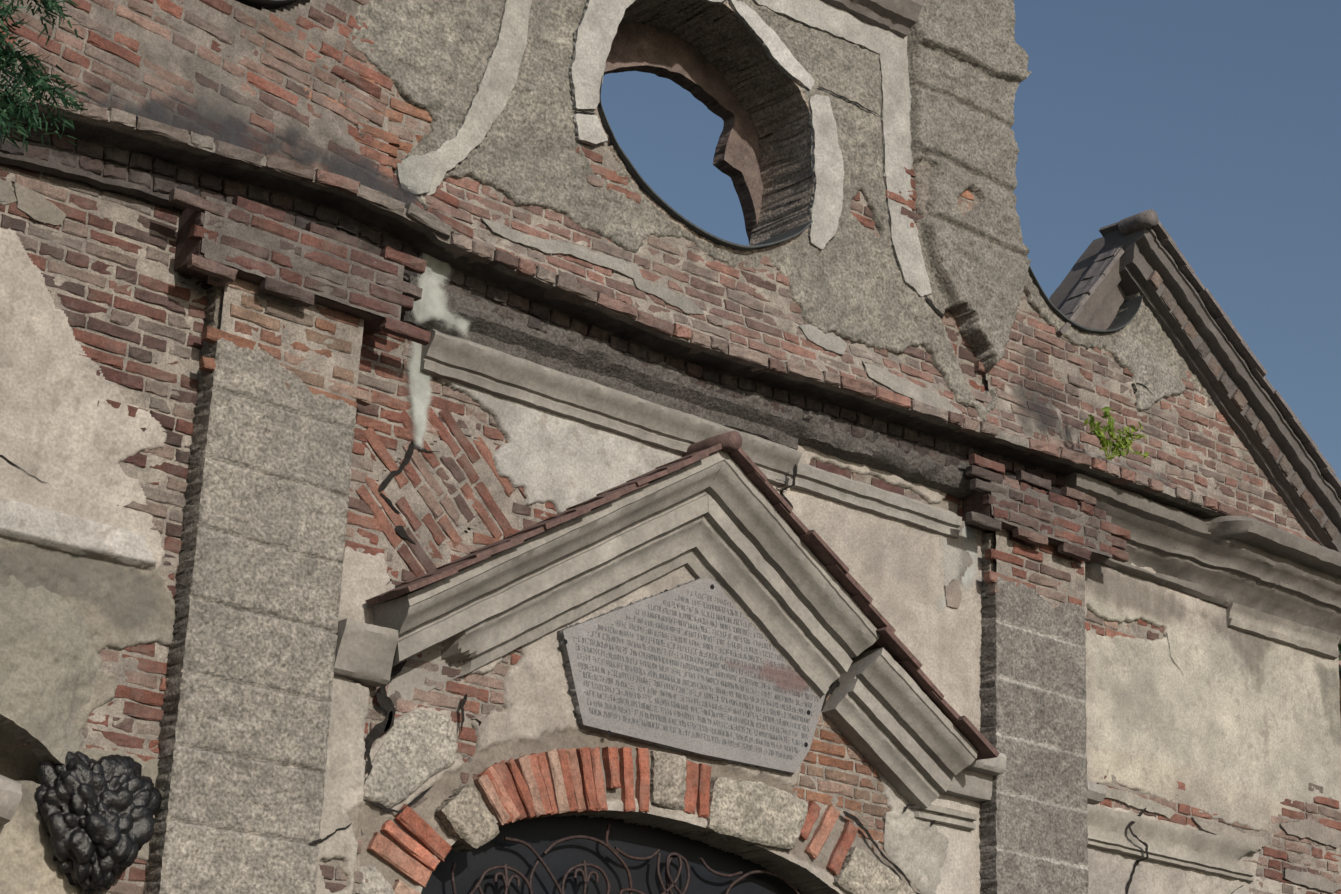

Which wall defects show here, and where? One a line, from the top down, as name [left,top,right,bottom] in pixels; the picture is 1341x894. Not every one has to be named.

leakage [413,253,468,333]
spalling [0,0,1320,599]
leakage [410,342,431,446]
crack [379,441,439,544]
crack [776,464,797,510]
peeling [944,579,962,609]
spalling [984,529,1165,641]
spalling [81,642,171,762]
crack [309,660,432,844]
crack [821,678,841,712]
crack [1126,808,1149,894]
spalling [1097,775,1341,894]